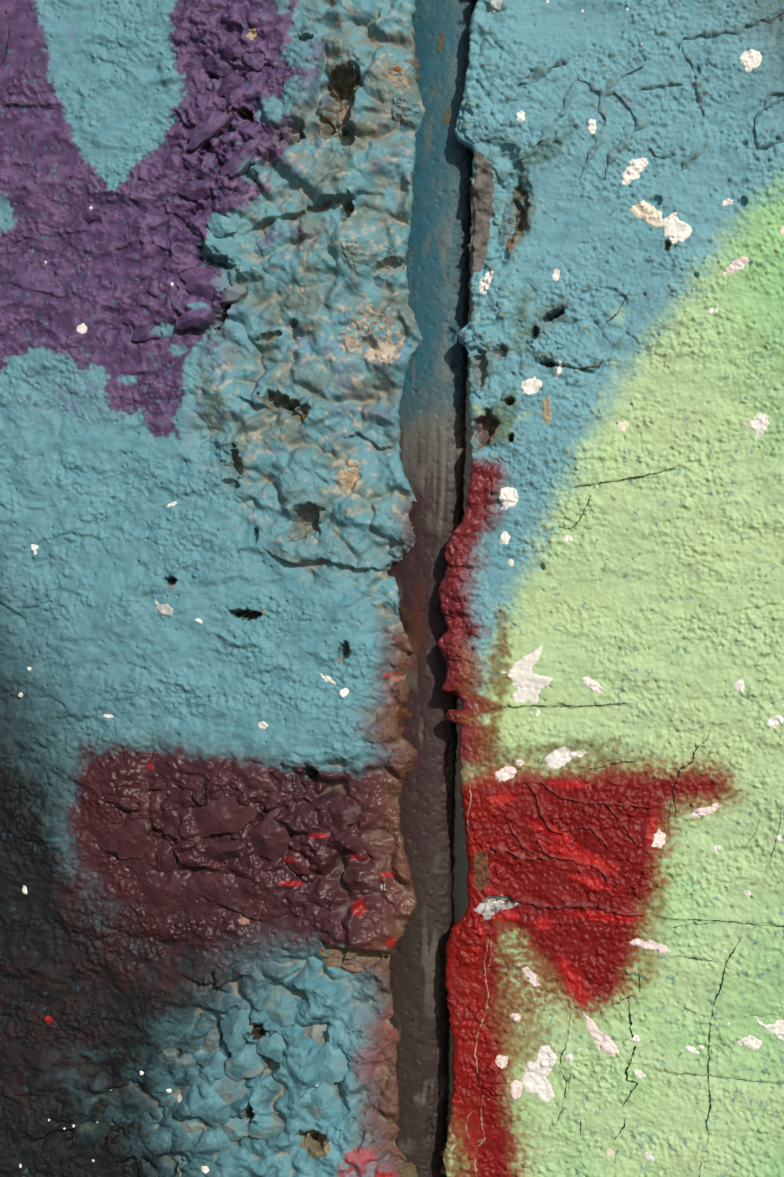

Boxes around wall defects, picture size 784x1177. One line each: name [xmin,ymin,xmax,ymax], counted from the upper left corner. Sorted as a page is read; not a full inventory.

spalling [468,151,530,273]
crack [465,927,493,1176]
crack [553,1012,582,1135]
crack [607,914,784,1177]